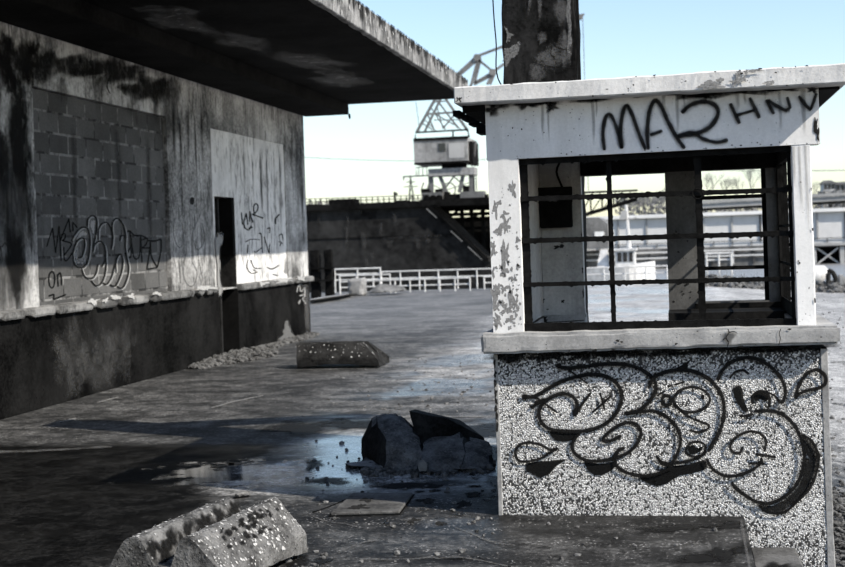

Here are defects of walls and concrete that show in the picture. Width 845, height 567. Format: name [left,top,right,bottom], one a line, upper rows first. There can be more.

peeling [0,34,171,193]
water stain [154,81,203,160]
water stain [282,55,363,84]
flaking render [503,26,520,66]
peeling [696,67,784,90]
peeling [490,180,522,330]